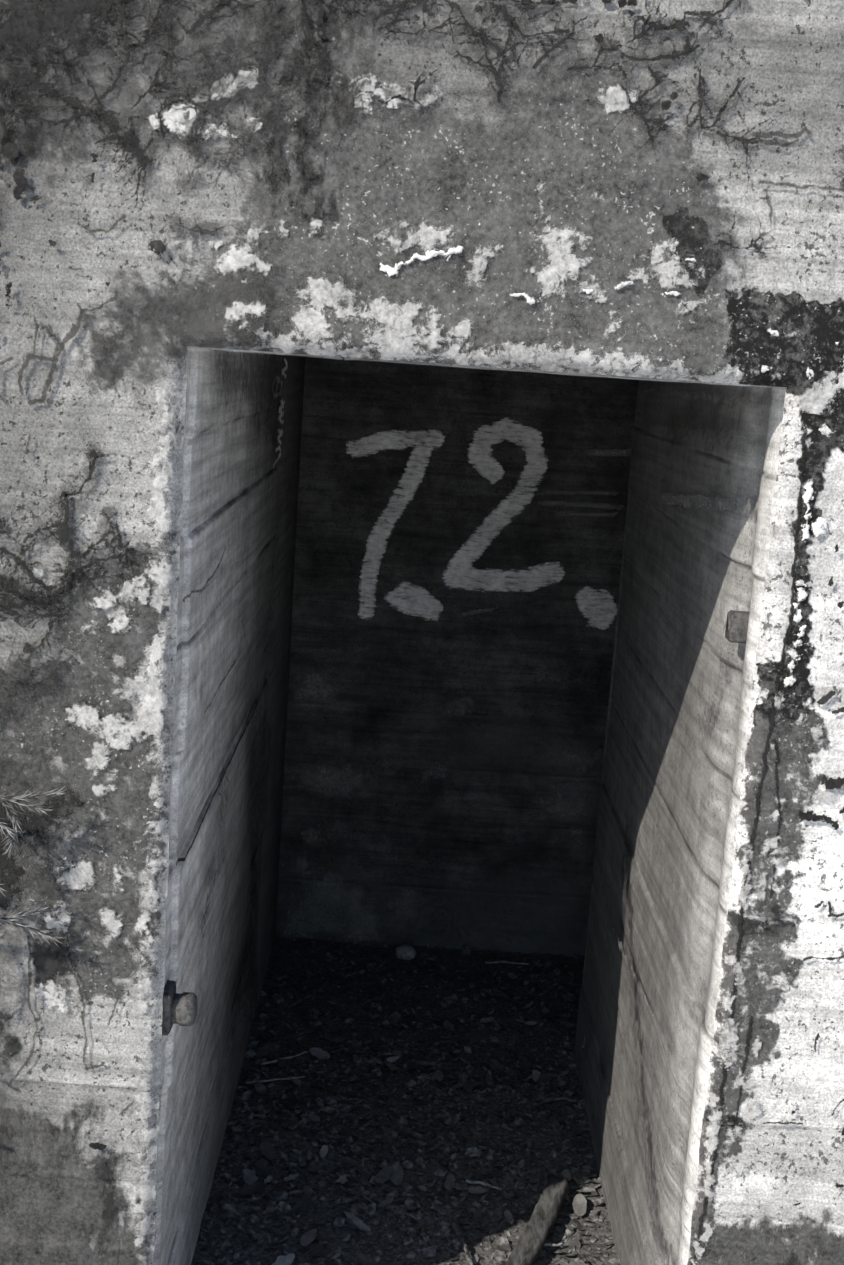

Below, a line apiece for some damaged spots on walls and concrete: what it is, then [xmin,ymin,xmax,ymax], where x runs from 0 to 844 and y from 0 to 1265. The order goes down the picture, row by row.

peeling [148,67,262,140]
peeling [597,84,639,113]
peeling [156,220,289,284]
leakage [81,0,844,440]
peeling [224,184,733,383]
peeling [801,342,844,437]
crack [817,691,844,714]
leakage [0,532,177,1003]
leakage [687,388,844,1265]
crack [814,901,844,918]
crack [803,954,844,962]
leakage [0,1102,150,1265]